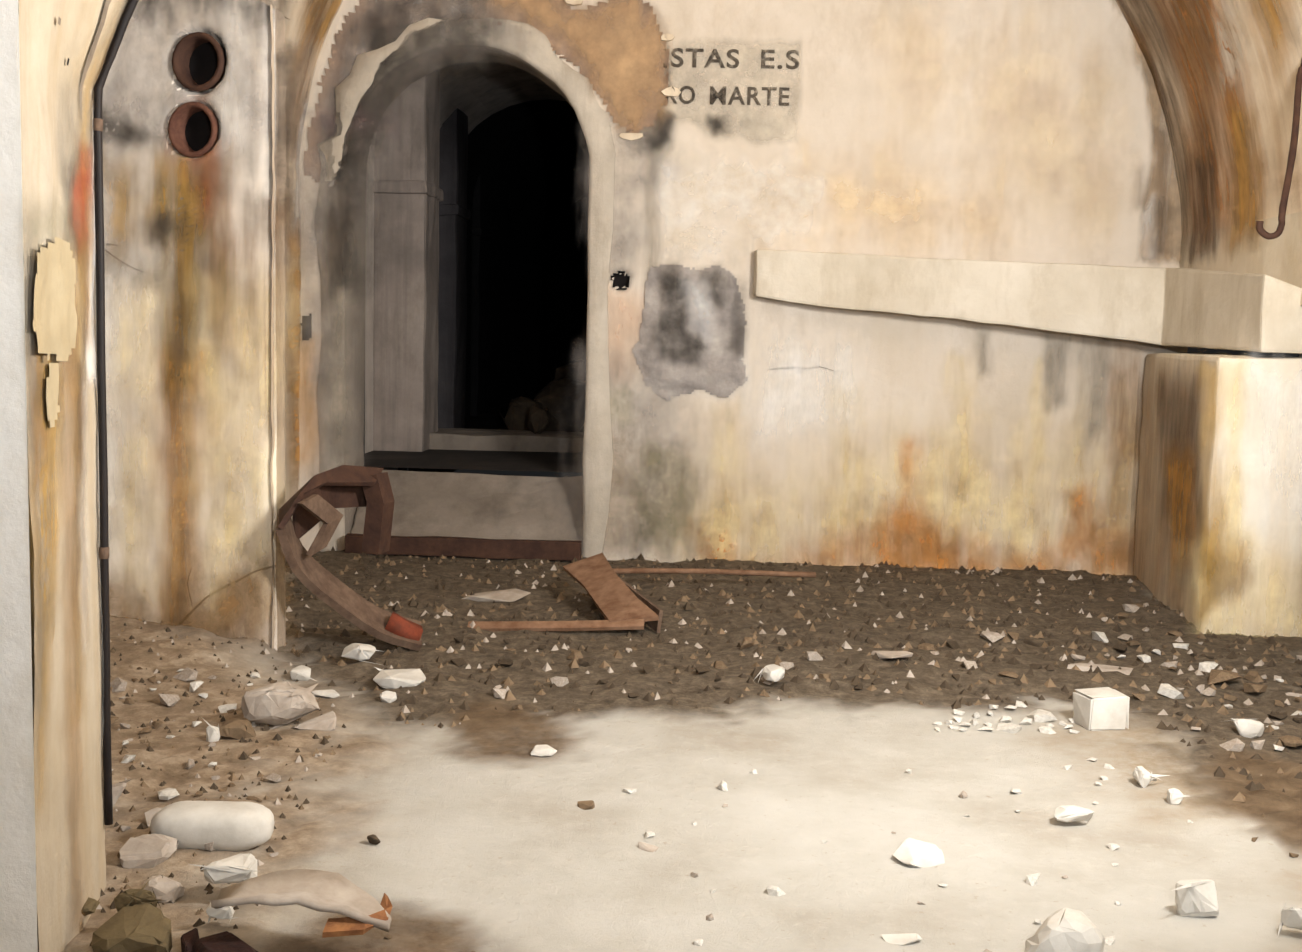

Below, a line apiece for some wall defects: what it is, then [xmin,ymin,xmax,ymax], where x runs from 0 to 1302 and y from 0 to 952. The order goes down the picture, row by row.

leakage [78,132,128,292]
leakage [93,80,141,142]
spalling [277,0,681,183]
leakage [1116,0,1261,262]
peeling [33,237,77,428]
leakage [100,129,260,636]
corrosion [700,536,730,559]